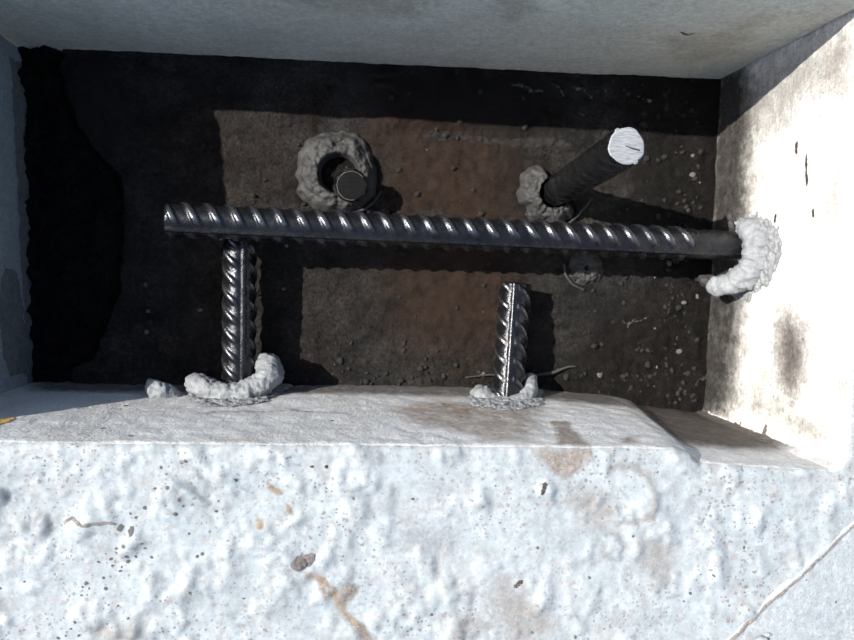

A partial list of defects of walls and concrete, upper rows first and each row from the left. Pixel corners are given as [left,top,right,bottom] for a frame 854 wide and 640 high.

peeling [0,269,27,376]
leakage [779,321,802,389]
corrosion [314,577,368,637]
crack [730,525,854,640]